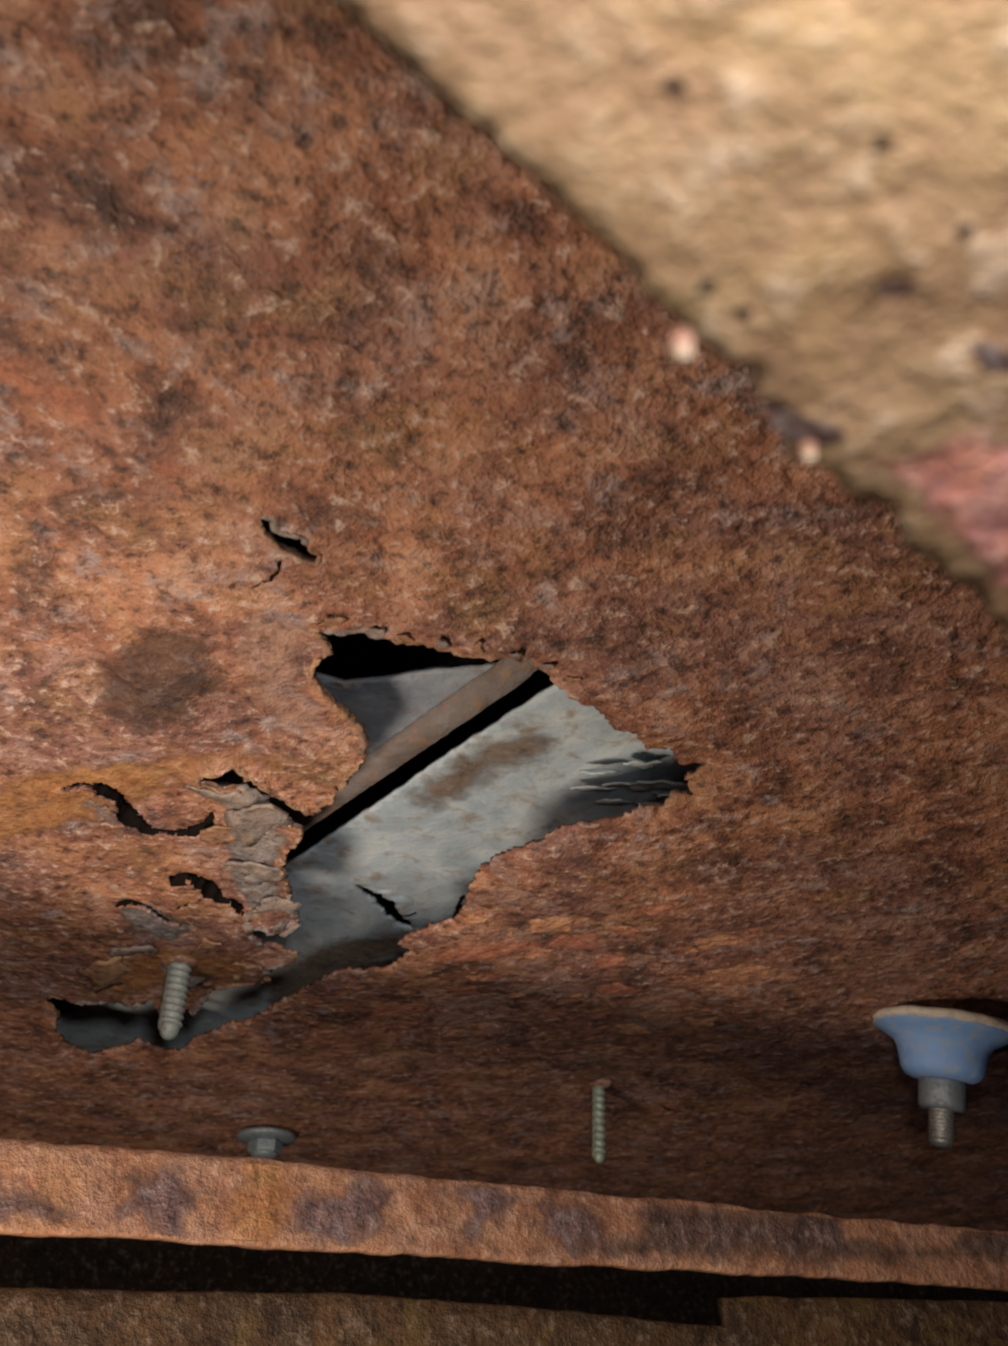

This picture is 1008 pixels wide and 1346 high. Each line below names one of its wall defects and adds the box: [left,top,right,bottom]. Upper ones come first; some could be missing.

rust [764,405,846,446]
rust [886,428,1008,584]
crack [254,542,285,588]
rust [102,630,218,731]
rust [420,737,548,803]
rust [570,760,692,805]
rust [0,757,302,935]
crack [365,887,419,925]
crack [453,895,465,917]
rust [76,907,409,1002]
rust [367,886,800,1049]
rust [119,1169,193,1236]